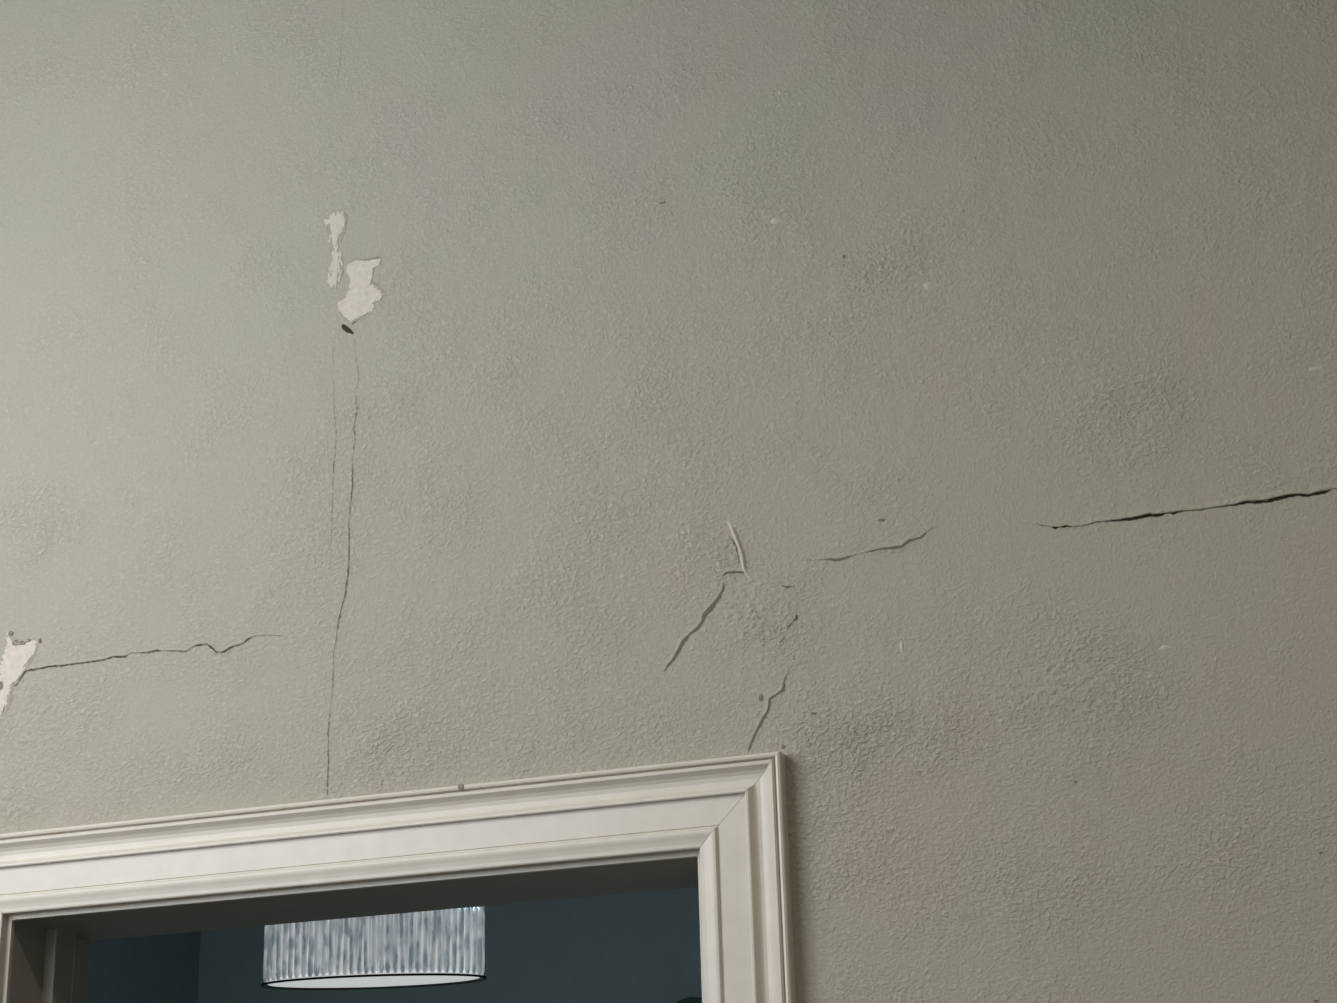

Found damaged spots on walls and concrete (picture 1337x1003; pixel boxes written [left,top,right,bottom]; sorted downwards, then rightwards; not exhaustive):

peeling [321,209,386,334]
crack [1035,483,1337,531]
peeling [0,631,41,724]
crack [16,633,289,681]
crack [327,413,357,793]
crack [661,568,748,672]
crack [746,523,940,752]